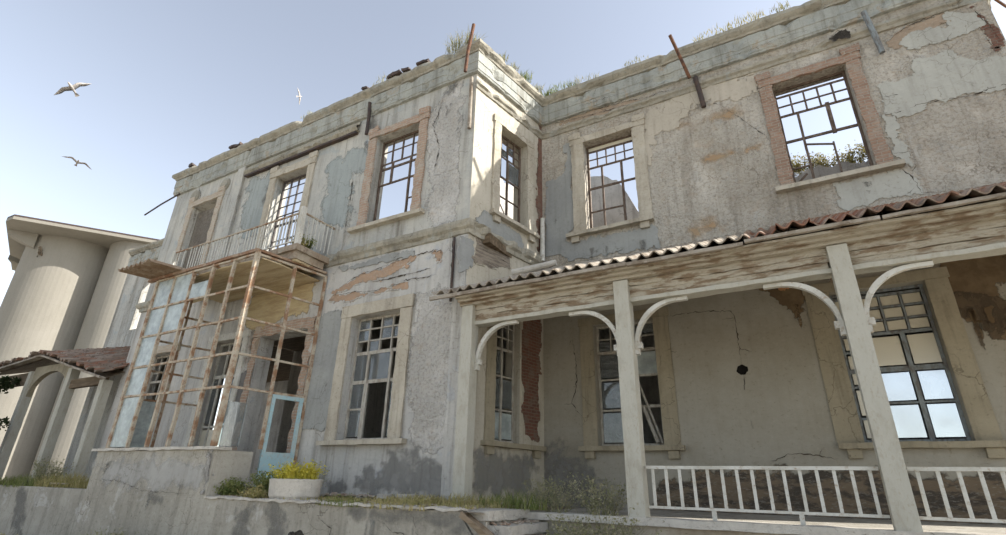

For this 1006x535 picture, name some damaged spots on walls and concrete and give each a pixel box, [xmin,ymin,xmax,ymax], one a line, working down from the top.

spalling [886,12,951,49]
spalling [970,6,1005,51]
spalling [328,255,416,303]
spalling [521,319,542,443]